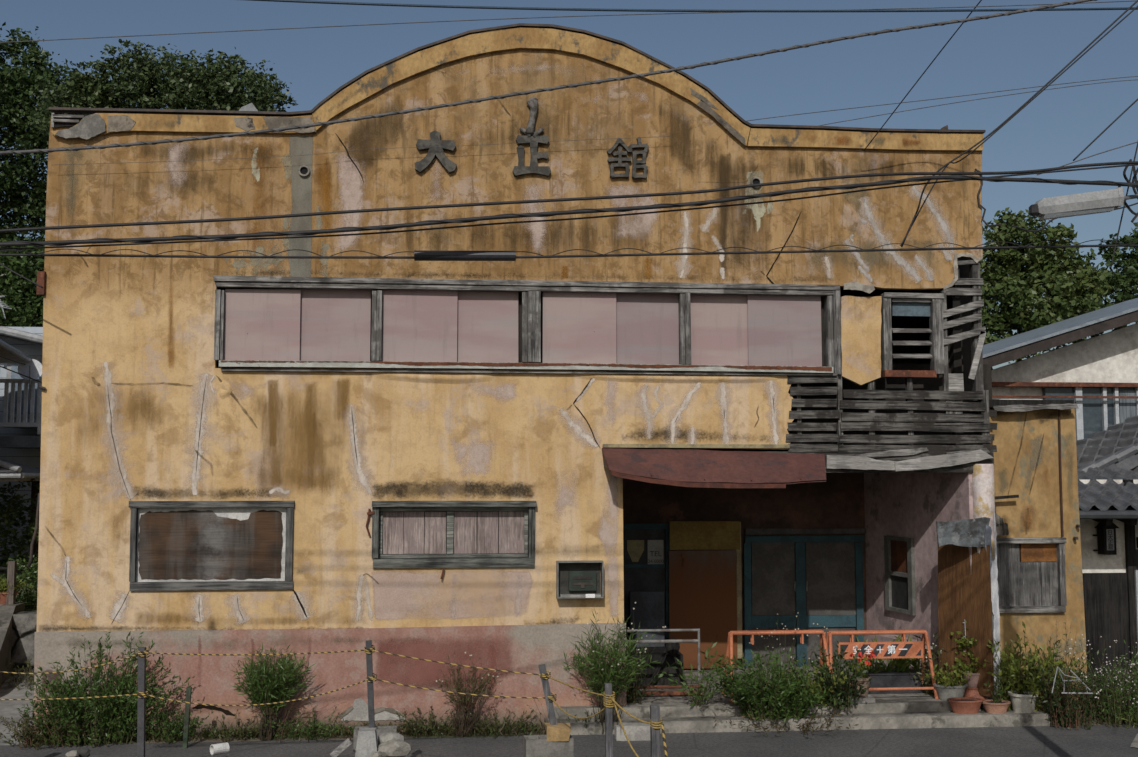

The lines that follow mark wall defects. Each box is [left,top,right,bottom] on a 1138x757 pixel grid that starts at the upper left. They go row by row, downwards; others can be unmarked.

spalling [51,113,136,140]
crack [335,133,364,182]
damp [716,157,756,268]
peeling [745,172,773,231]
crack [761,212,801,284]
damp [338,380,348,417]
crack [561,378,600,448]
damp [220,381,328,498]
damp [133,490,180,498]
damp [374,482,444,497]
damp [460,483,532,497]